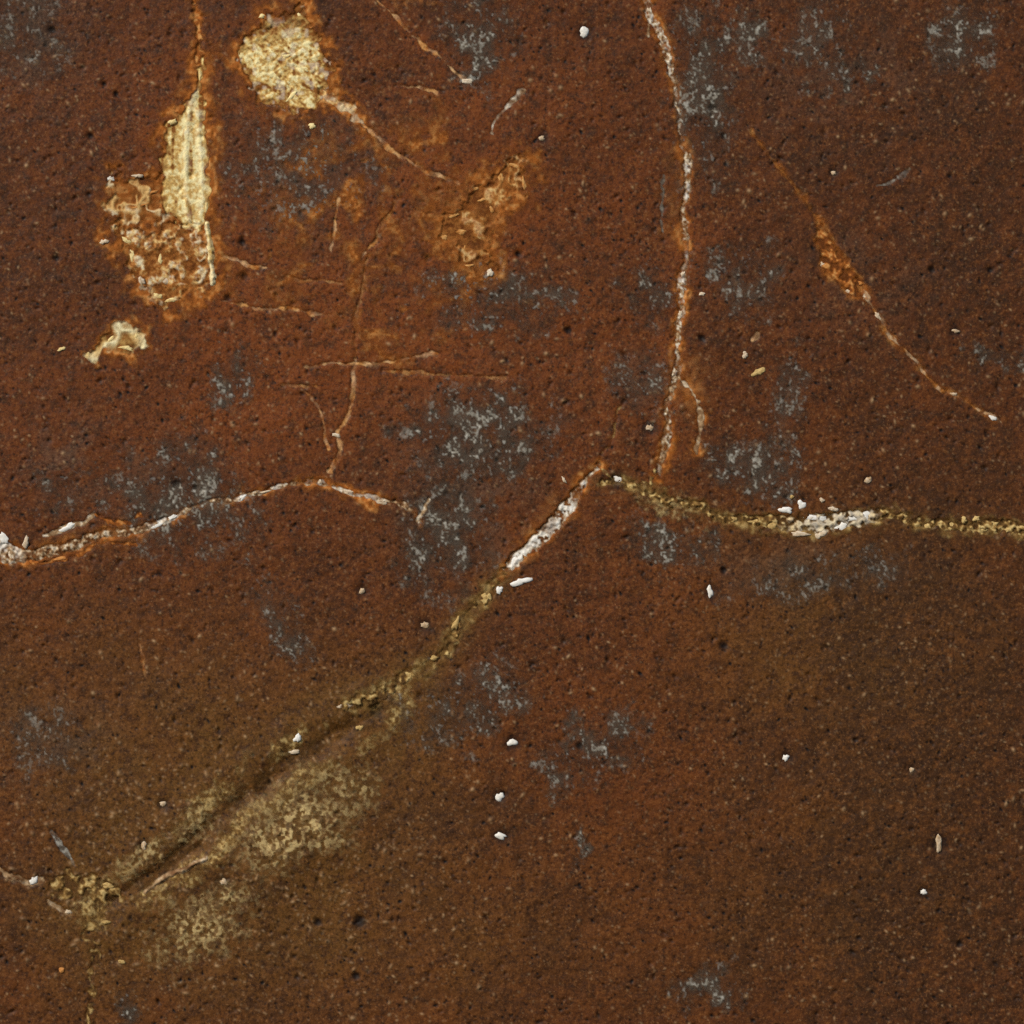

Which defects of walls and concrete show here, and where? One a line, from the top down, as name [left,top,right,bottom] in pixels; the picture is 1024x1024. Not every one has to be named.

peeling [95,0,367,323]
corrosion [400,123,448,166]
corrosion [285,178,362,238]
peeling [84,316,152,368]
crack [337,0,1024,741]
crack [0,476,430,567]
leakage [639,520,677,564]
leakage [464,665,527,732]
crack [0,726,330,1024]